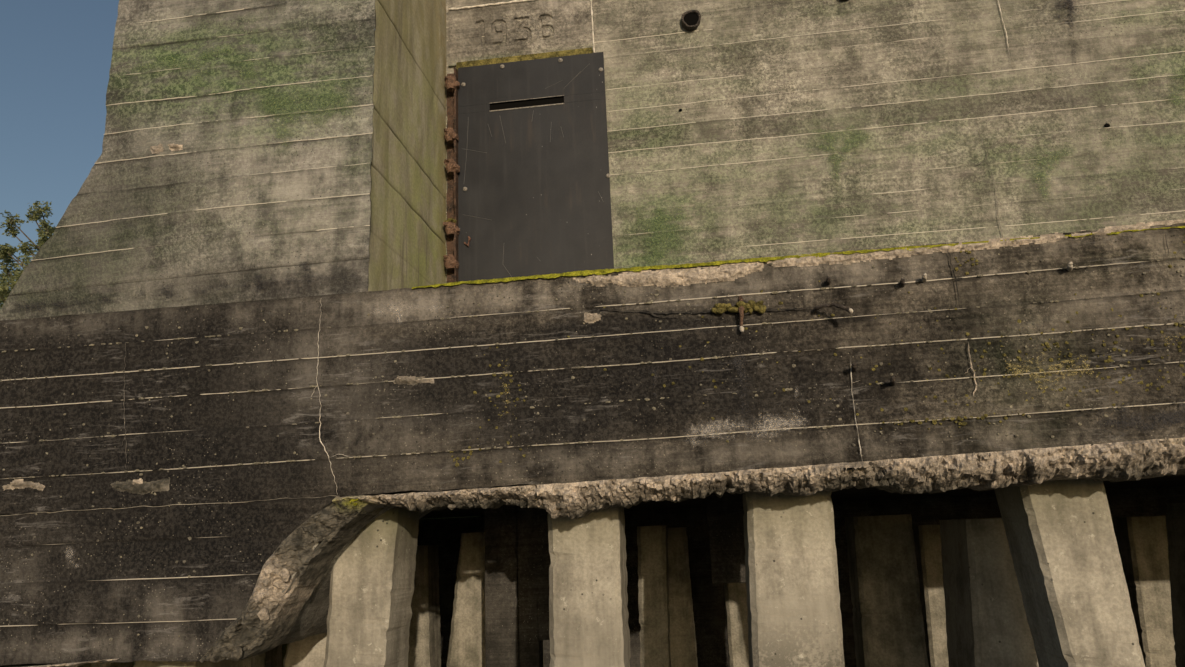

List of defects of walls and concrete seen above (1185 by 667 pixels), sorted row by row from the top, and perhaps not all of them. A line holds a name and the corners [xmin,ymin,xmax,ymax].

crack [313,300,351,492]
spalling [199,437,1185,663]